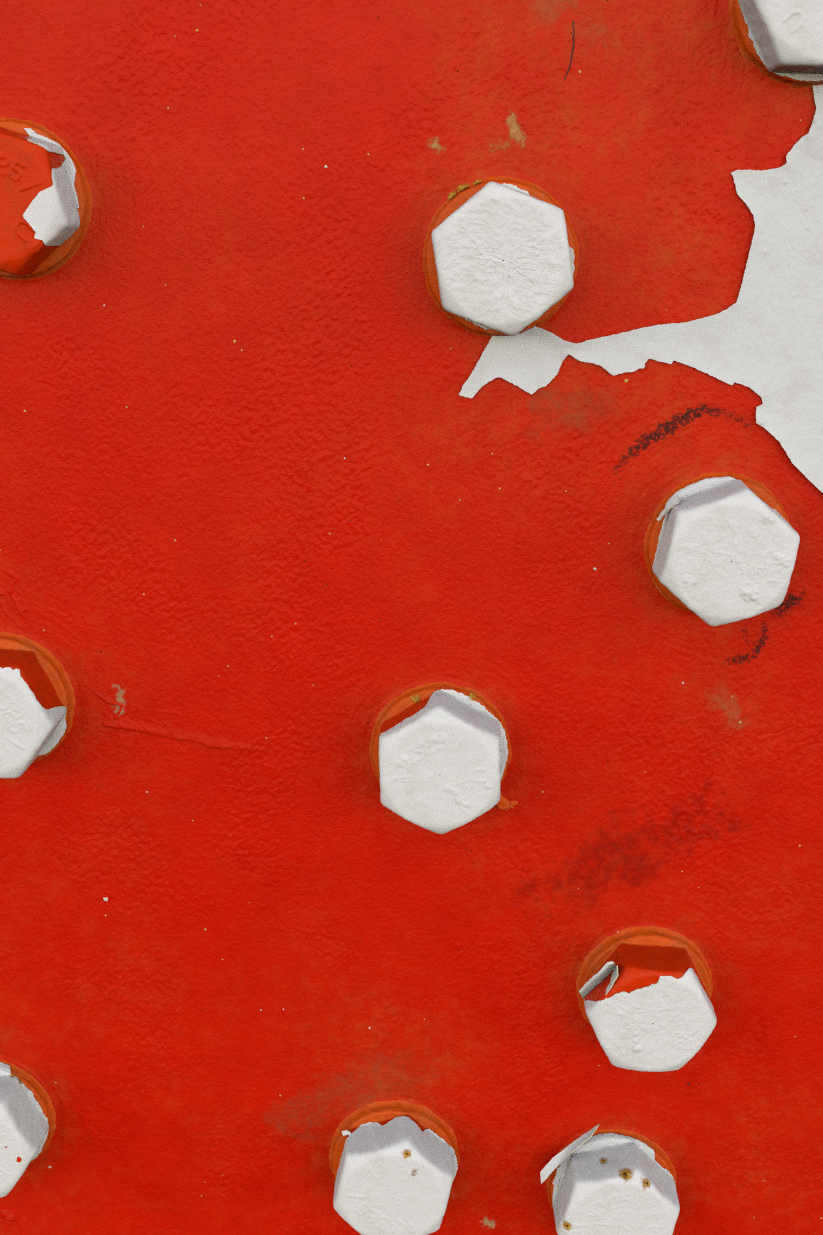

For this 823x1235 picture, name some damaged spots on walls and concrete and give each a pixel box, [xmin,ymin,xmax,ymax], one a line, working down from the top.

peeling [459,85,823,493]
peeling [657,495,680,521]
peeling [579,961,619,999]
peeling [540,1124,600,1184]